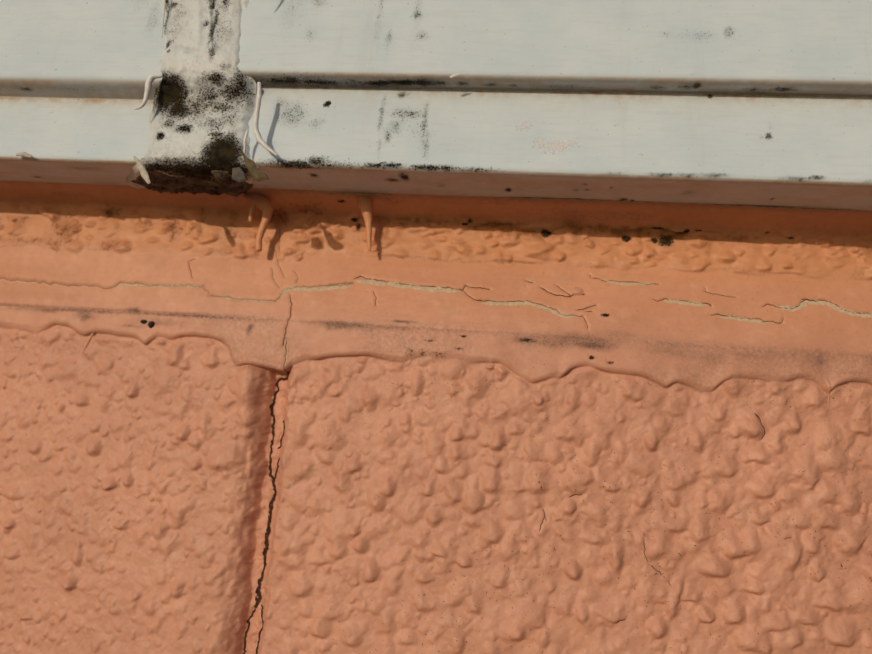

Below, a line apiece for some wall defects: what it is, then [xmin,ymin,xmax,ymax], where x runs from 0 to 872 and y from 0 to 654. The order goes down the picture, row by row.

peeling [134,73,163,110]
peeling [243,82,278,156]
leakage [130,0,492,197]
leakage [651,227,702,246]
crack [0,229,872,654]